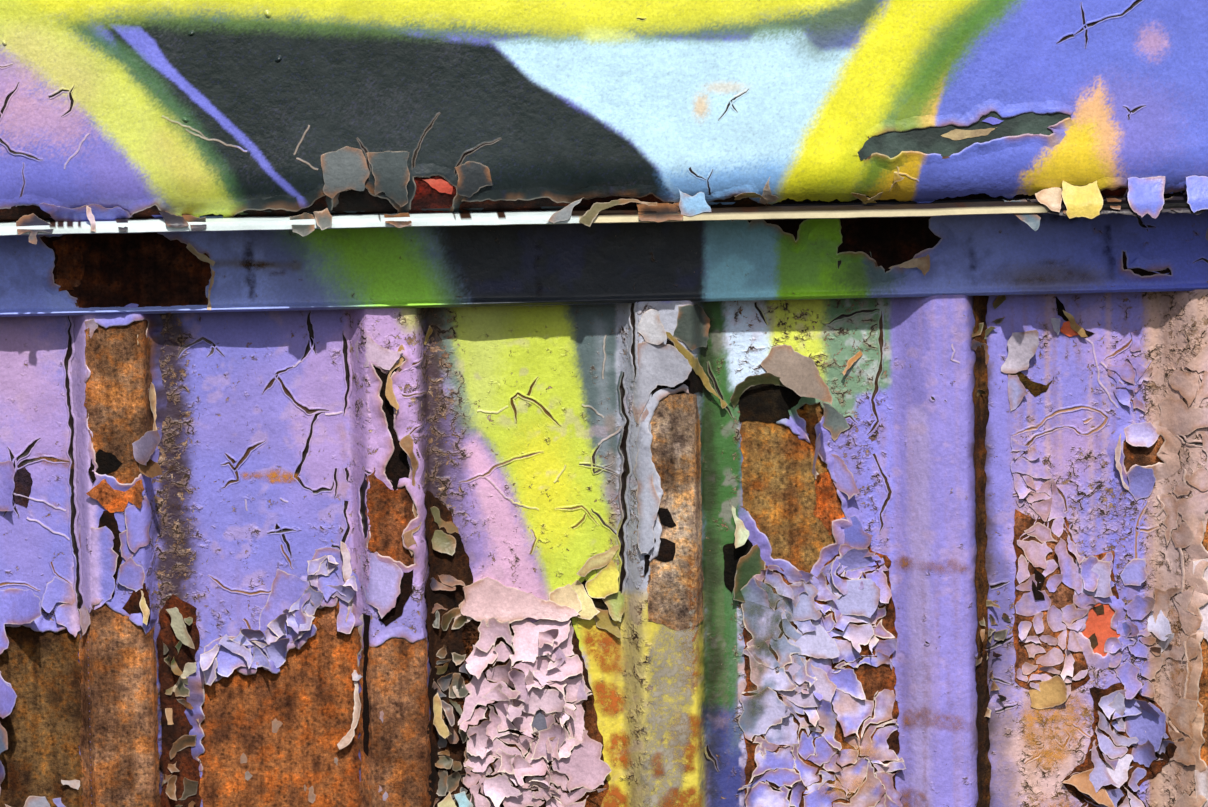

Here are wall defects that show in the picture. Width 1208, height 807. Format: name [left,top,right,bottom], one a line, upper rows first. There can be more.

crack [1056,0,1145,49]
crack [0,63,90,199]
peeling [223,99,1075,283]
peeling [1002,175,1208,231]
crack [1122,104,1147,120]
crack [176,335,226,359]
crack [207,310,372,629]
peeling [0,194,625,807]
peeling [632,304,906,807]
peeling [971,295,1208,807]
rust [662,787,702,807]
rust [680,714,701,772]